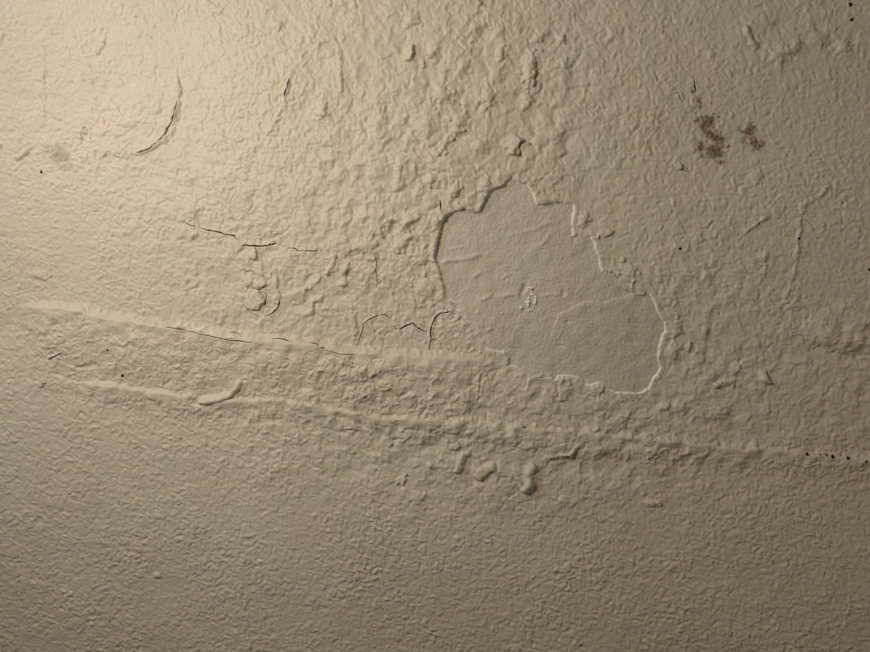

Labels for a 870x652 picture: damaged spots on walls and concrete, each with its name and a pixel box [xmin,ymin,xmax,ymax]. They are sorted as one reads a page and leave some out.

crack [165,219,456,358]